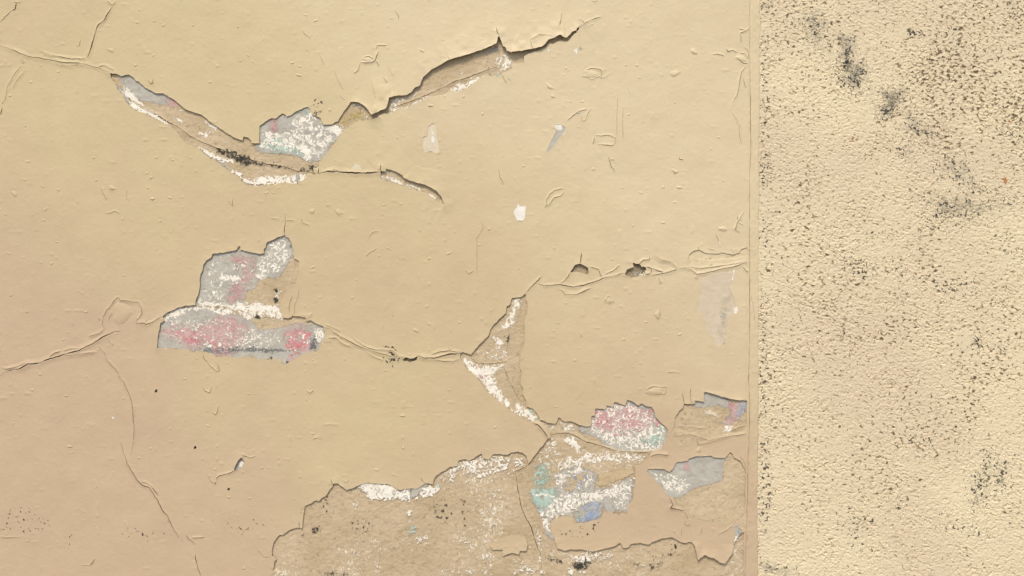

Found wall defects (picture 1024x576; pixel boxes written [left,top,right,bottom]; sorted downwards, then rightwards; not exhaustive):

crack [0,0,386,178]
peeling [106,0,598,210]
peeling [151,230,330,373]
crack [198,0,756,576]
spalling [619,256,651,283]
crack [0,295,205,576]
peeling [266,287,756,576]